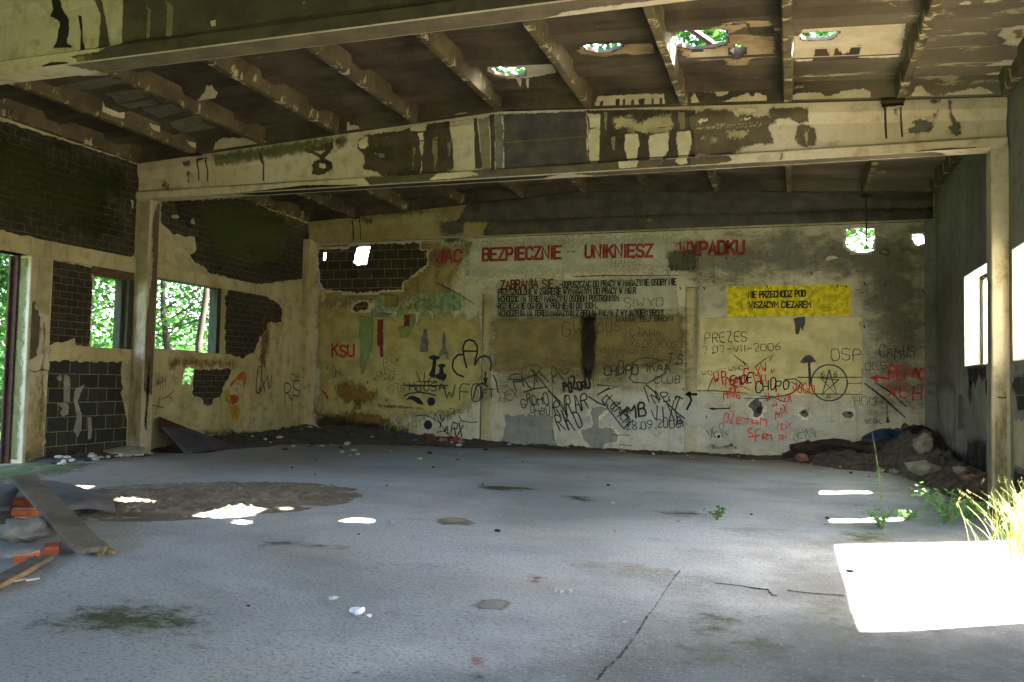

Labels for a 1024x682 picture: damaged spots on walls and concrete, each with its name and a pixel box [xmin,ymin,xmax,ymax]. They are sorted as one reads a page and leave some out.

peeling [794,24,906,62]
peeling [487,64,556,88]
peeling [102,103,125,118]
damp [214,138,334,181]
peeling [430,171,478,181]
peeling [618,160,638,169]
spalling [0,119,355,406]
spalling [317,241,428,313]
spalling [44,359,128,456]
crack [597,571,680,680]